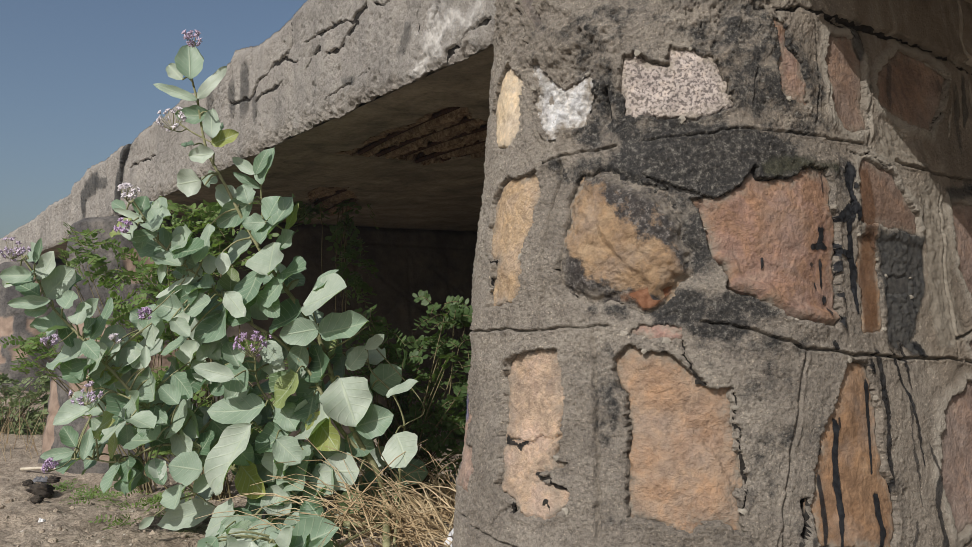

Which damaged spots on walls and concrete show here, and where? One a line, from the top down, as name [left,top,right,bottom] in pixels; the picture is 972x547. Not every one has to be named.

crack [231,1,390,105]
spalling [335,60,595,165]
crack [447,18,491,62]
crack [758,6,972,131]